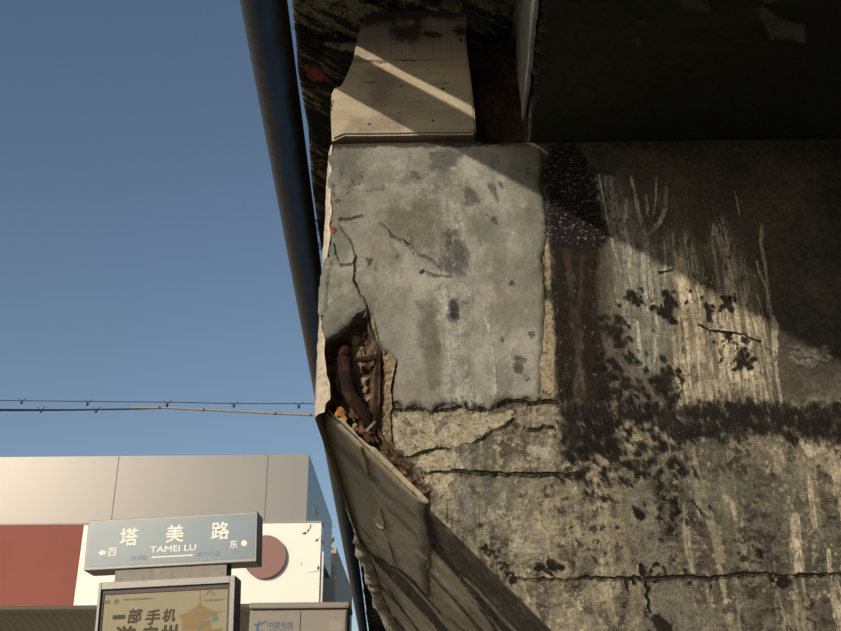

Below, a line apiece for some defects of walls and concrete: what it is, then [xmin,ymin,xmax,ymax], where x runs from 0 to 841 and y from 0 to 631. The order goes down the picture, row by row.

peeling [511,0,539,121]
crack [332,214,450,320]
leakage [518,143,841,631]
crack [392,398,558,445]
crack [361,446,376,485]
peeling [322,313,431,596]
crack [396,447,577,479]
crack [375,509,397,566]
crack [518,564,841,612]